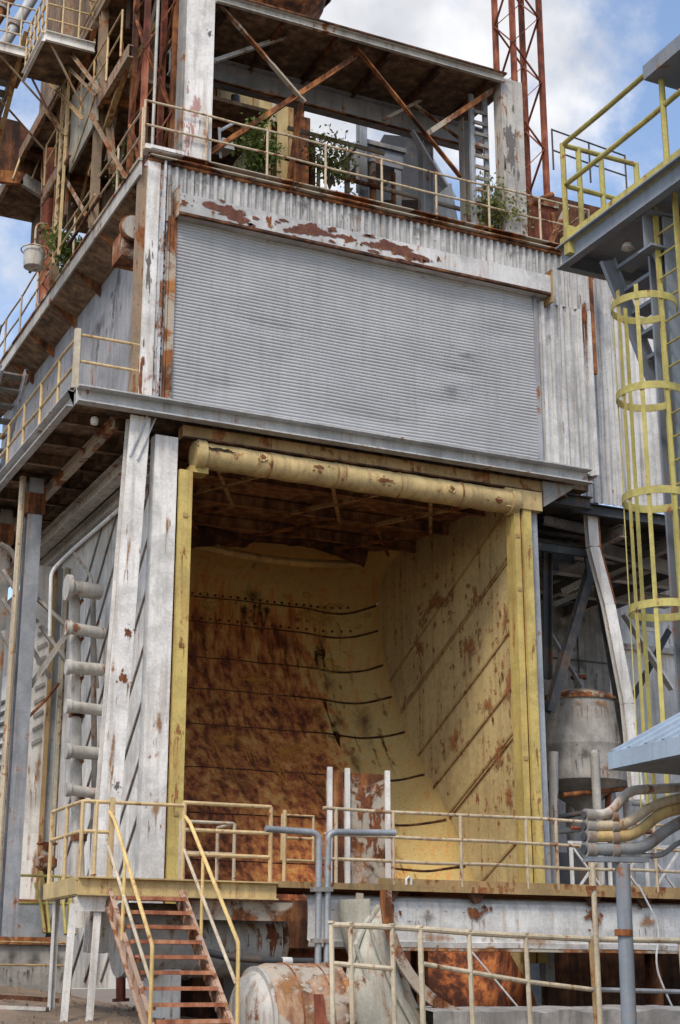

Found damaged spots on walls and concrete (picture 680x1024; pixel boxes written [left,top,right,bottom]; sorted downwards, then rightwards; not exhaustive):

corrosion [410,573,482,680]
corrosion [476,660,511,723]
corrosion [319,738,411,884]
corrosion [486,740,515,813]
corrosion [269,969,315,1009]